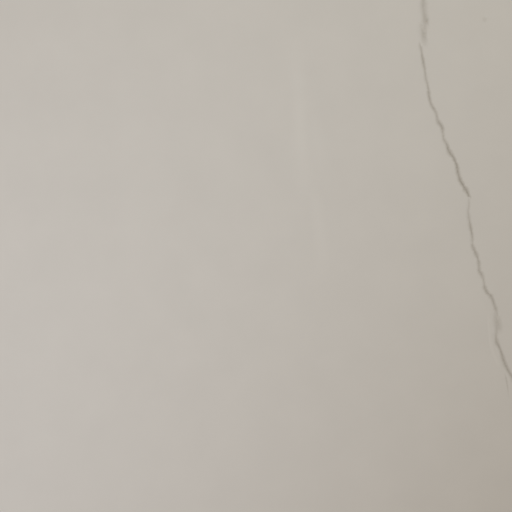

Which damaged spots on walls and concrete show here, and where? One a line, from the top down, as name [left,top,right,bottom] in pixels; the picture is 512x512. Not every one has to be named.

crack [417,0,512,398]